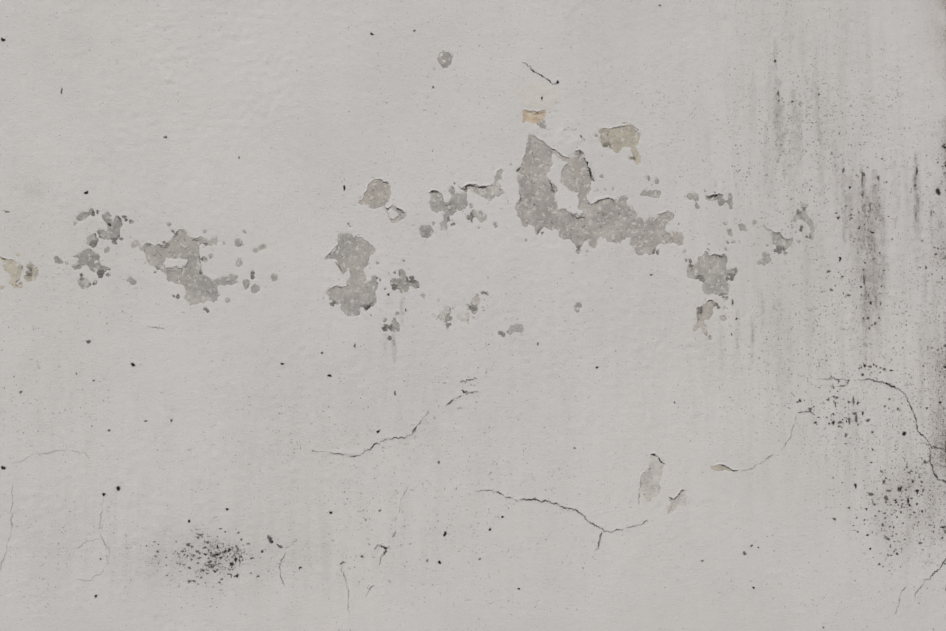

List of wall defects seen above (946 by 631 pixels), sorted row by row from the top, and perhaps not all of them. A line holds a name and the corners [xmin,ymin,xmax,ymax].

peeling [359,177,407,223]
peeling [419,108,815,340]
peeling [0,253,39,290]
peeling [54,208,266,313]
peeling [322,223,426,316]
peeling [382,312,400,341]
leakage [789,376,874,444]
crack [836,378,946,483]
peeling [638,451,687,514]
leakage [848,389,946,571]
crack [480,490,620,546]
leakage [146,520,253,588]